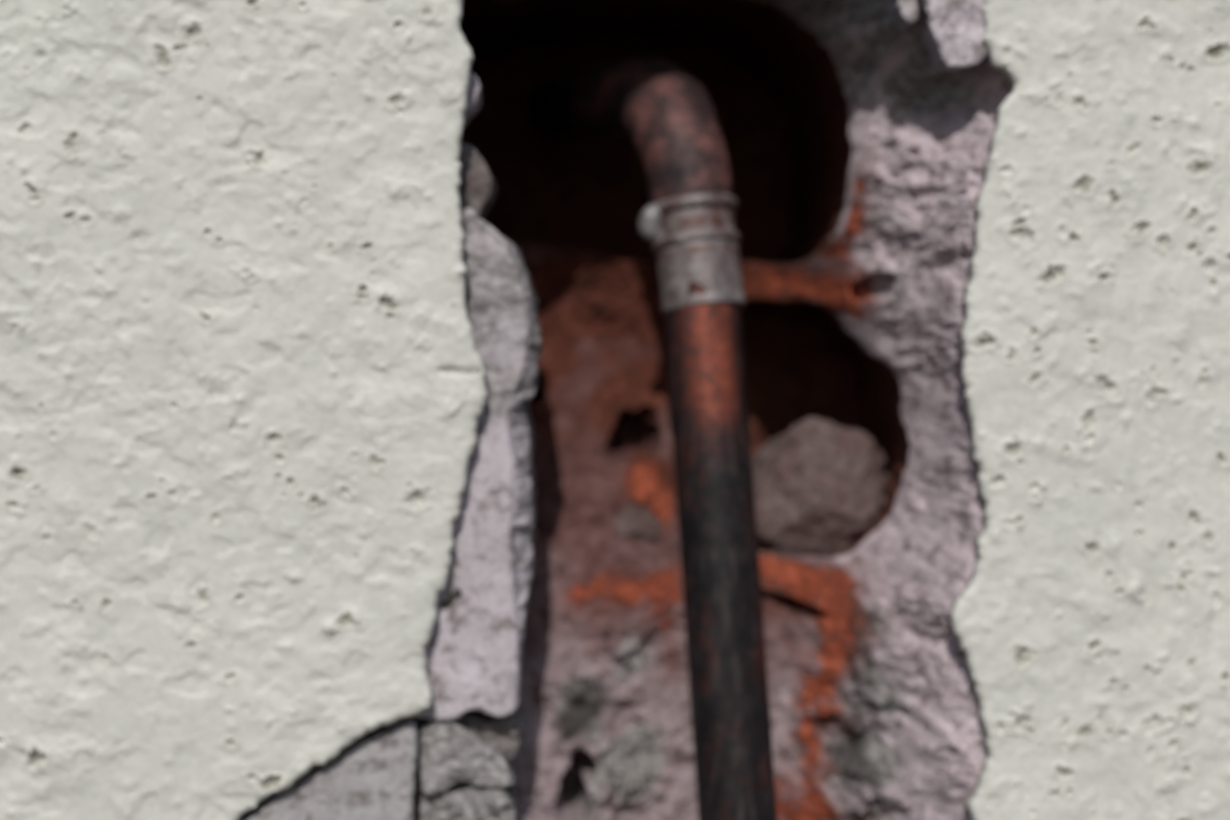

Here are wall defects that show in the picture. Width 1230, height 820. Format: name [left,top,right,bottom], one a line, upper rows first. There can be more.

spalling [239,72,699,820]
rust [630,464,673,523]
spalling [739,0,1011,820]
rust [569,568,681,627]
crack [415,722,473,820]